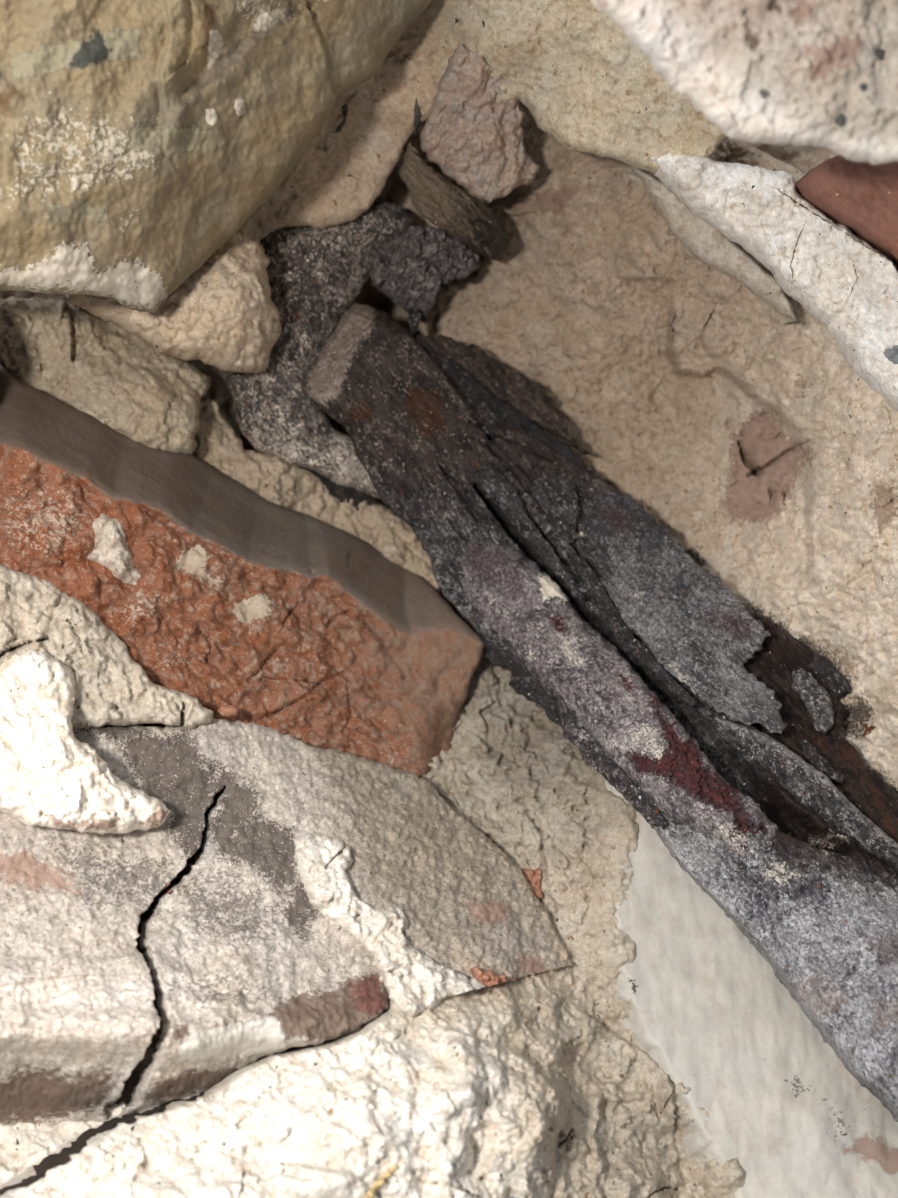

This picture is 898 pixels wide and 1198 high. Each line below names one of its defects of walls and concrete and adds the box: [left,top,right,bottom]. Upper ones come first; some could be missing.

rust [616,674,773,853]
crack [0,848,205,1195]